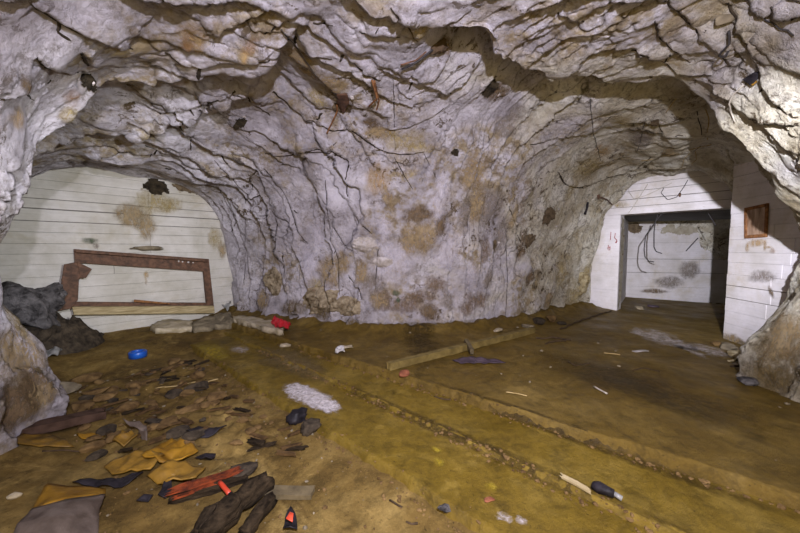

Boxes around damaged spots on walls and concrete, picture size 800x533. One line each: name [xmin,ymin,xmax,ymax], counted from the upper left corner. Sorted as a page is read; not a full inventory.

crack [30,3,90,73]
crack [203,4,297,44]
crack [631,0,732,77]
crack [726,2,737,22]
crack [165,52,201,80]
crack [159,90,288,150]
crack [748,106,799,127]
spalling [141,178,198,197]
crack [199,54,437,299]
crack [558,154,663,188]
water stain [116,194,175,237]
water stain [643,264,699,293]